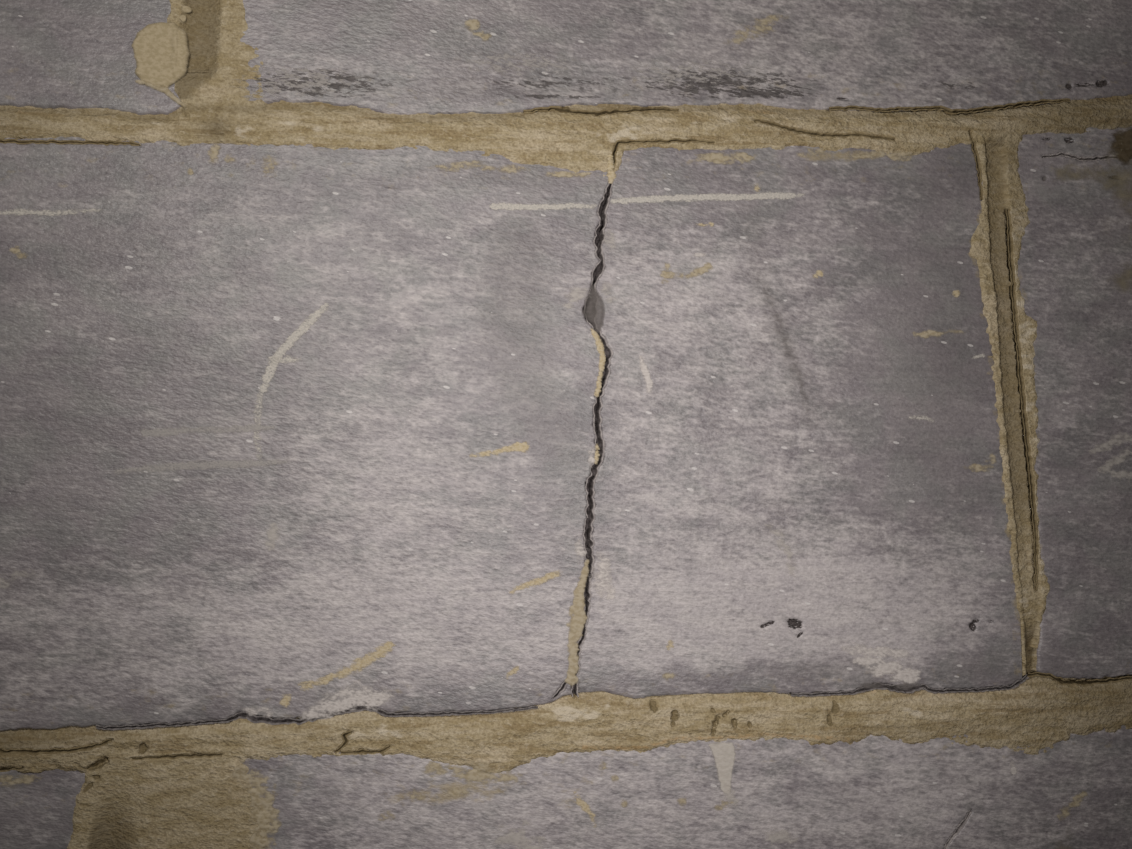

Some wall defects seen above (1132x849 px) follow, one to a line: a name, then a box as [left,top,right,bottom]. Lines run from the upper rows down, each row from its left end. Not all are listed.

crack [552,138,715,699]